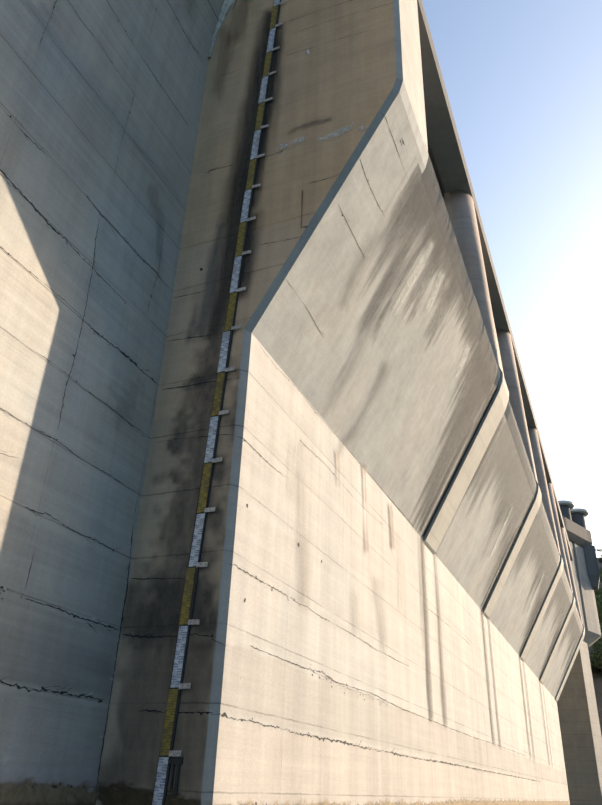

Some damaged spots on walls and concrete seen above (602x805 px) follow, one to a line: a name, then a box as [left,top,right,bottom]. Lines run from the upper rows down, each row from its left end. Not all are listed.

damp [206,12,281,361]
crack [0,169,287,789]
damp [366,162,498,721]
crack [231,564,408,666]
damp [0,779,153,805]
damp [165,791,200,805]
crack [141,709,539,782]
crack [251,646,525,756]